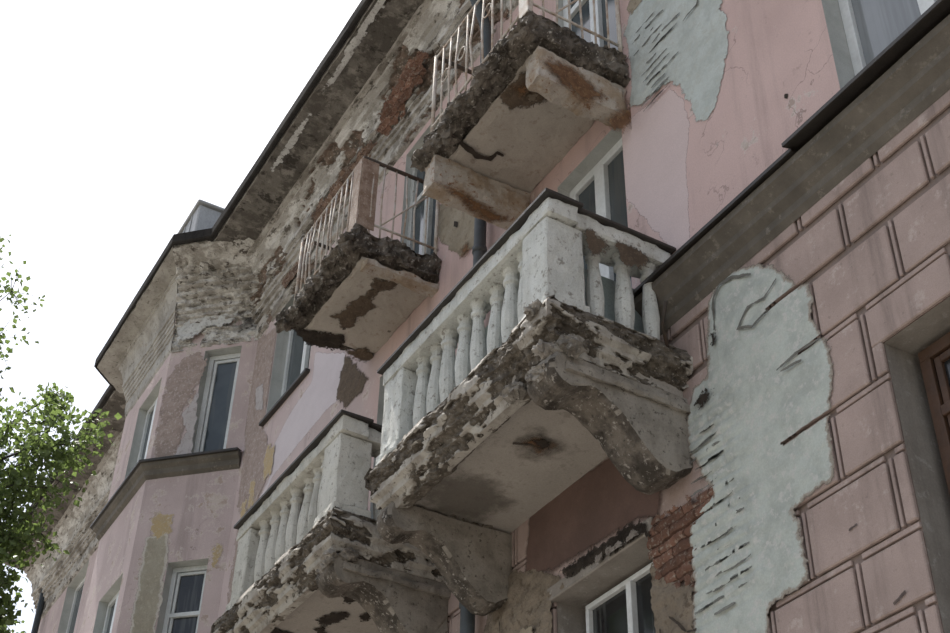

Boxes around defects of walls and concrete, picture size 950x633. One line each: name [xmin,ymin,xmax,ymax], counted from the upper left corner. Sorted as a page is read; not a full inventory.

flaking render [311,50,429,231]
spalling [410,9,531,172]
crack [452,134,504,161]
peeling [623,0,729,122]
spalling [438,204,475,257]
peeling [154,352,207,457]
peeling [176,310,239,342]
spalling [345,347,373,363]
spalling [330,278,397,328]
peeling [484,264,834,633]
flaking render [129,511,174,633]
spalling [313,596,370,633]